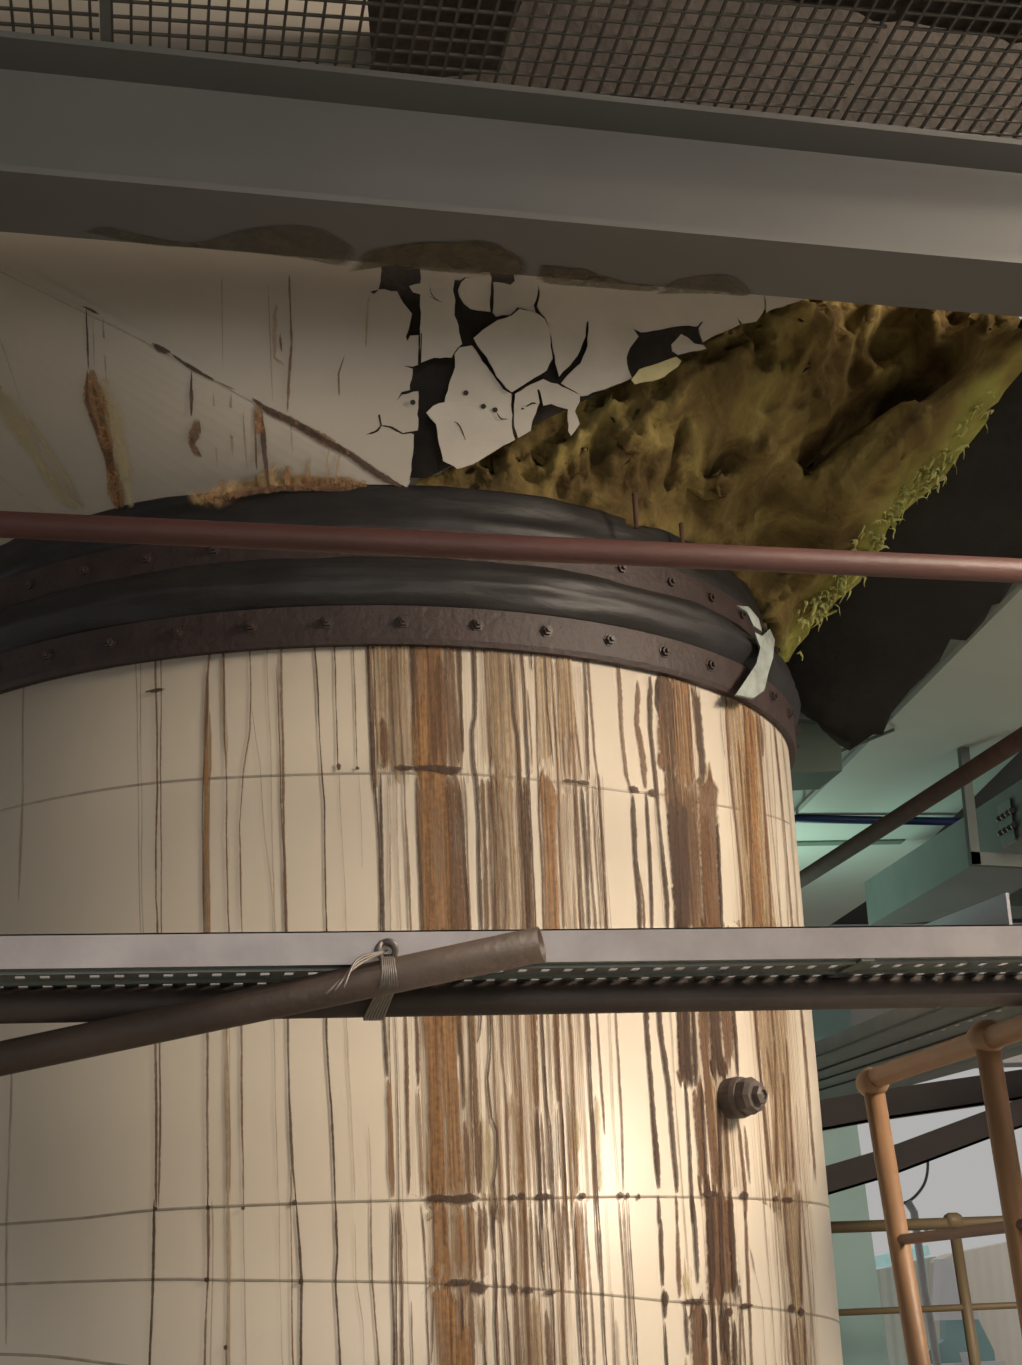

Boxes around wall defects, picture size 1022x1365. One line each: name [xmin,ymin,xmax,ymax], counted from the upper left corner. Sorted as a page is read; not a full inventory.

rust [83,306,134,509]
rust [189,275,403,503]
crack [367,415,414,435]
peeling [409,269,802,469]
rust [314,646,608,931]
rust [617,666,794,928]
rust [325,1018,341,1365]
rust [370,1013,640,1365]
rust [644,1010,817,1365]